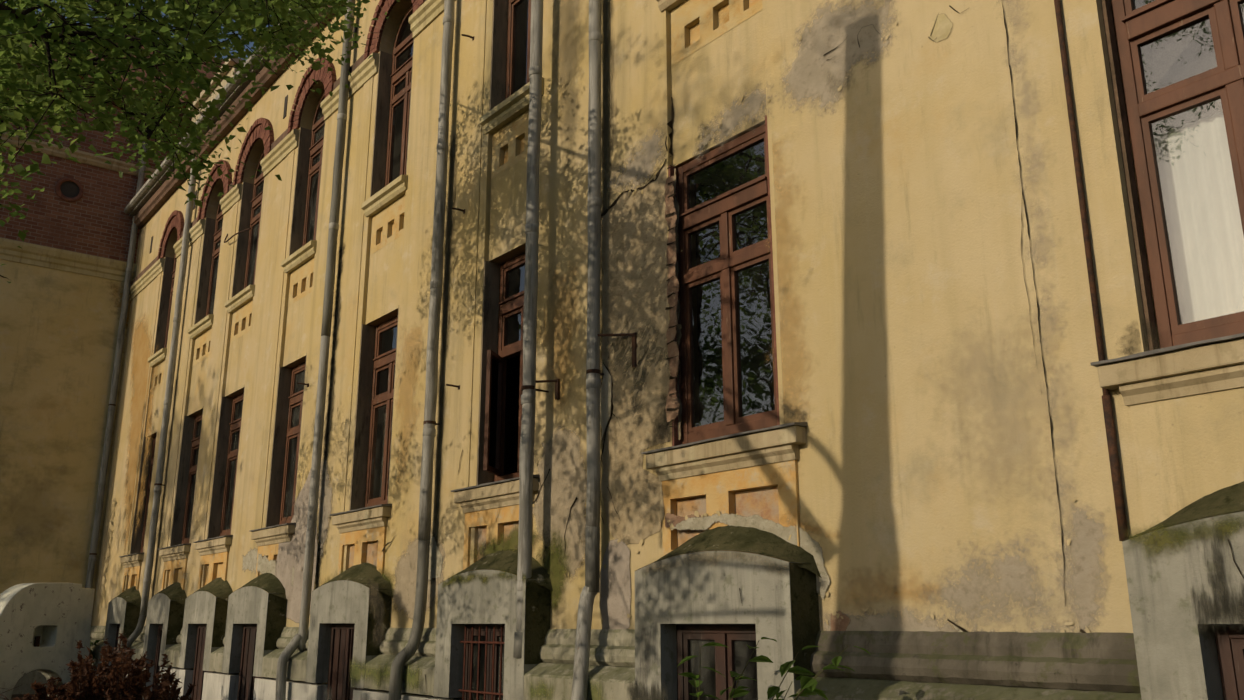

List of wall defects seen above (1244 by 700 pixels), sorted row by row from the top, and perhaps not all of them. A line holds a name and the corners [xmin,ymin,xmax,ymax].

peeling [783,0,898,111]
crack [564,97,679,549]
spalling [533,165,830,629]
spalling [824,607,968,632]
crack [1002,5,1066,606]
water stain [1193,535,1244,629]